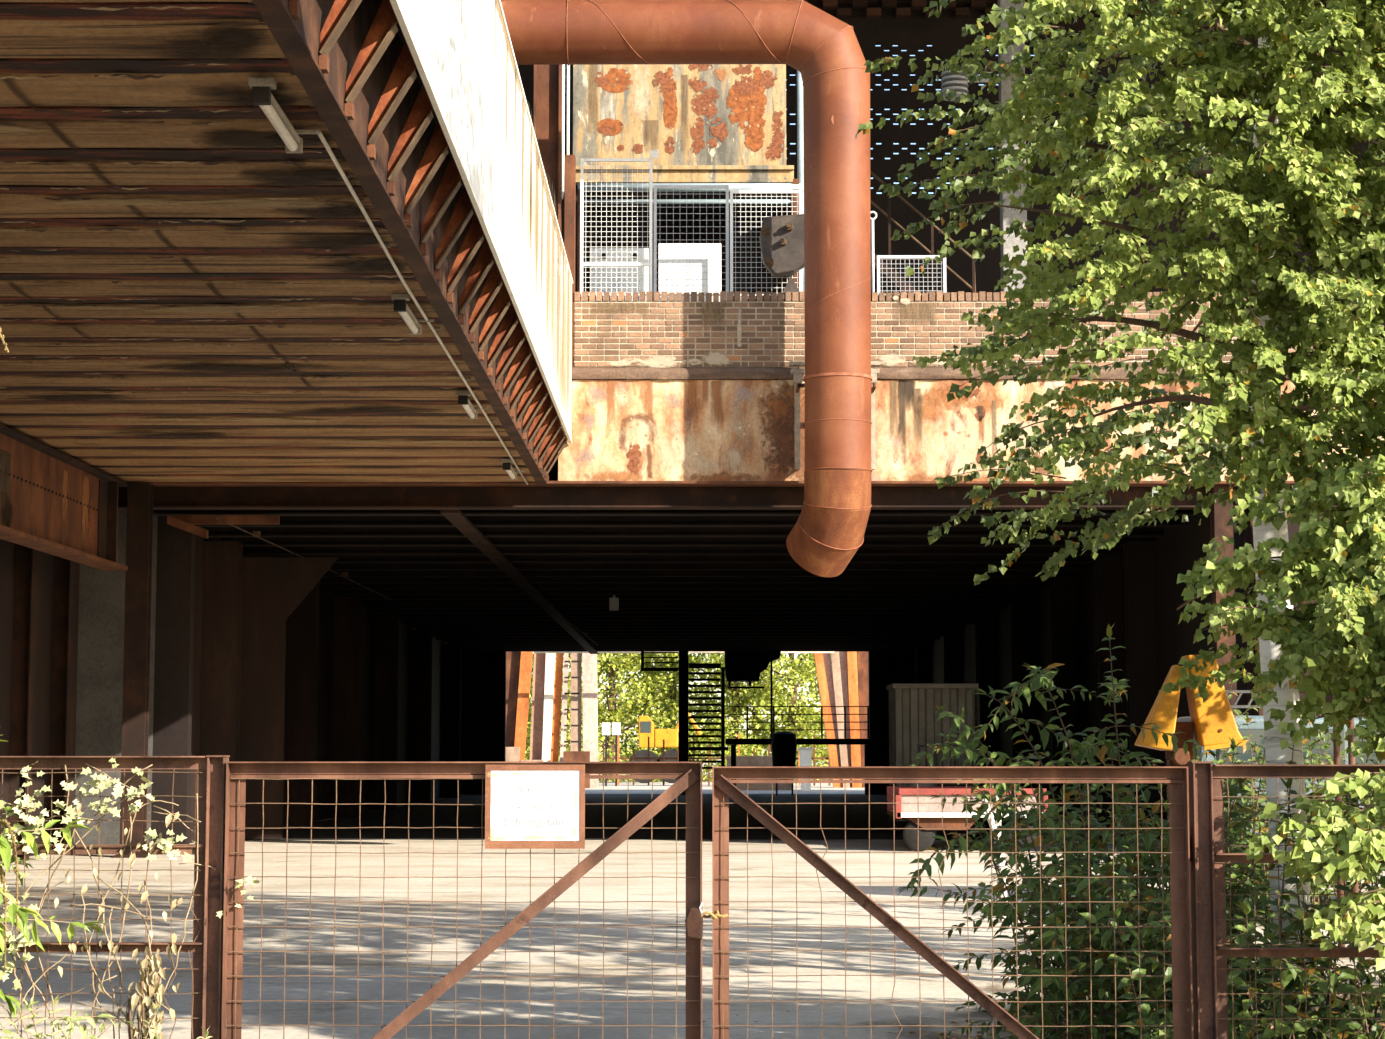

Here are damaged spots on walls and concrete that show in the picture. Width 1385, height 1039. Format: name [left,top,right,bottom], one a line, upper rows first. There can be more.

water stain [163,24,265,63]
corrosion [592,68,633,93]
corrosion [652,64,785,161]
corrosion [597,118,644,153]
water stain [0,79,374,388]
water stain [290,235,404,274]
water stain [122,407,438,438]
corrosion [688,380,805,481]
corrosion [594,472,642,481]
corrosion [913,454,995,481]